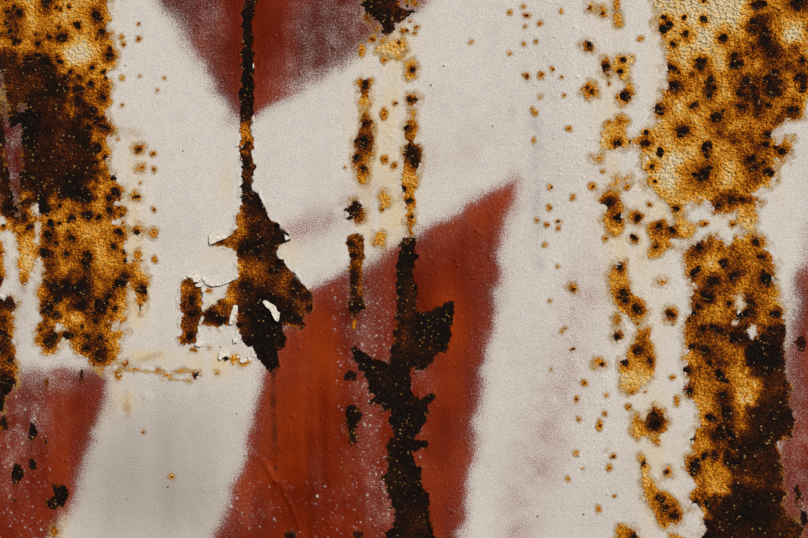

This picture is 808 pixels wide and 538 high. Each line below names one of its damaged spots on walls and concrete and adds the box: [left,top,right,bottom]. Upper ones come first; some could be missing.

rust [358,0,420,82]
rust [507,5,543,28]
rust [523,66,563,80]
rust [0,0,159,383]
peeling [177,192,313,372]
rust [343,77,455,538]
rust [579,0,808,538]
rust [0,295,21,431]
rust [11,458,37,487]
rust [28,422,47,444]
rust [44,483,69,510]